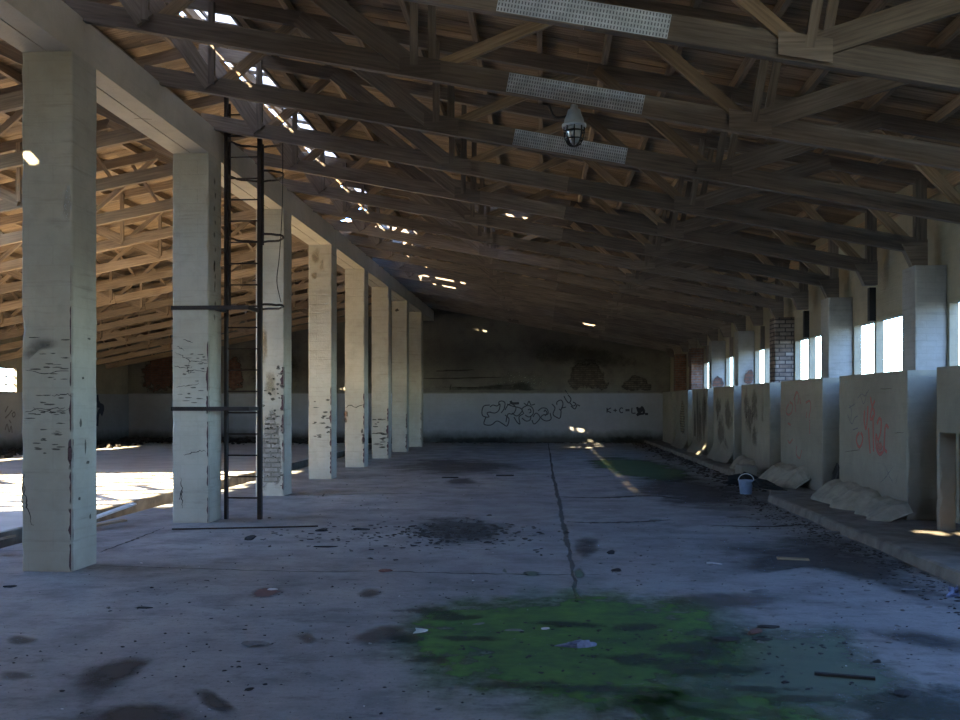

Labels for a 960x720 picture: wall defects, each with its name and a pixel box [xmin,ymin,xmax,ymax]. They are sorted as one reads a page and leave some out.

crack [21,474,32,525]
spalling [26,307,89,571]
flaking render [141,342,208,486]
flaking render [263,365,285,490]
crack [521,444,673,597]